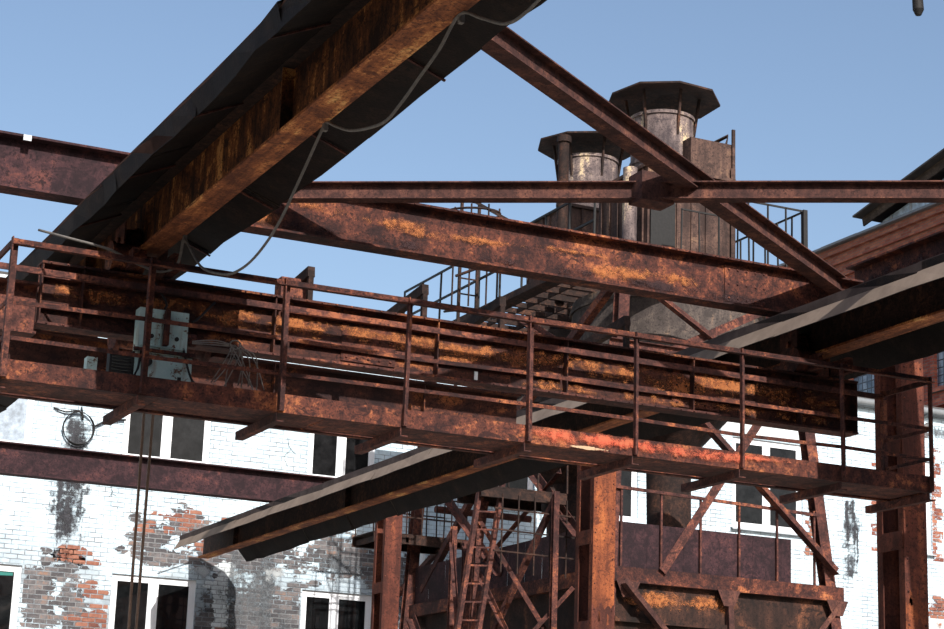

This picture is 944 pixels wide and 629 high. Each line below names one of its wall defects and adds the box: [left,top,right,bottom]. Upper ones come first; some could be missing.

rust [276,318,325,335]
rust [348,326,634,382]
rust [648,374,840,425]
damp [65,418,90,450]
peeling [20,544,109,629]
damp [49,481,91,539]
peeling [115,502,374,629]
rust [592,472,616,625]
damp [844,500,860,578]
rust [906,587,942,629]
spalling [928,595,944,619]
spalling [931,448,944,562]